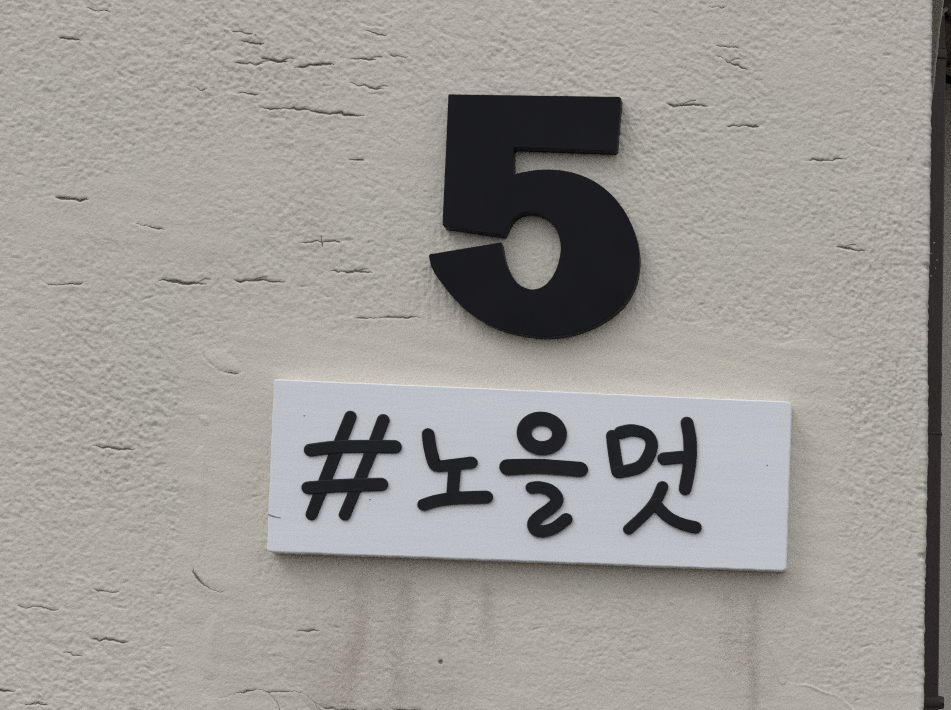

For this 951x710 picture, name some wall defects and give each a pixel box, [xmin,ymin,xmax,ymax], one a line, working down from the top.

crack [231,30,406,68]
crack [239,92,364,116]
crack [159,277,209,285]
crack [233,275,282,283]